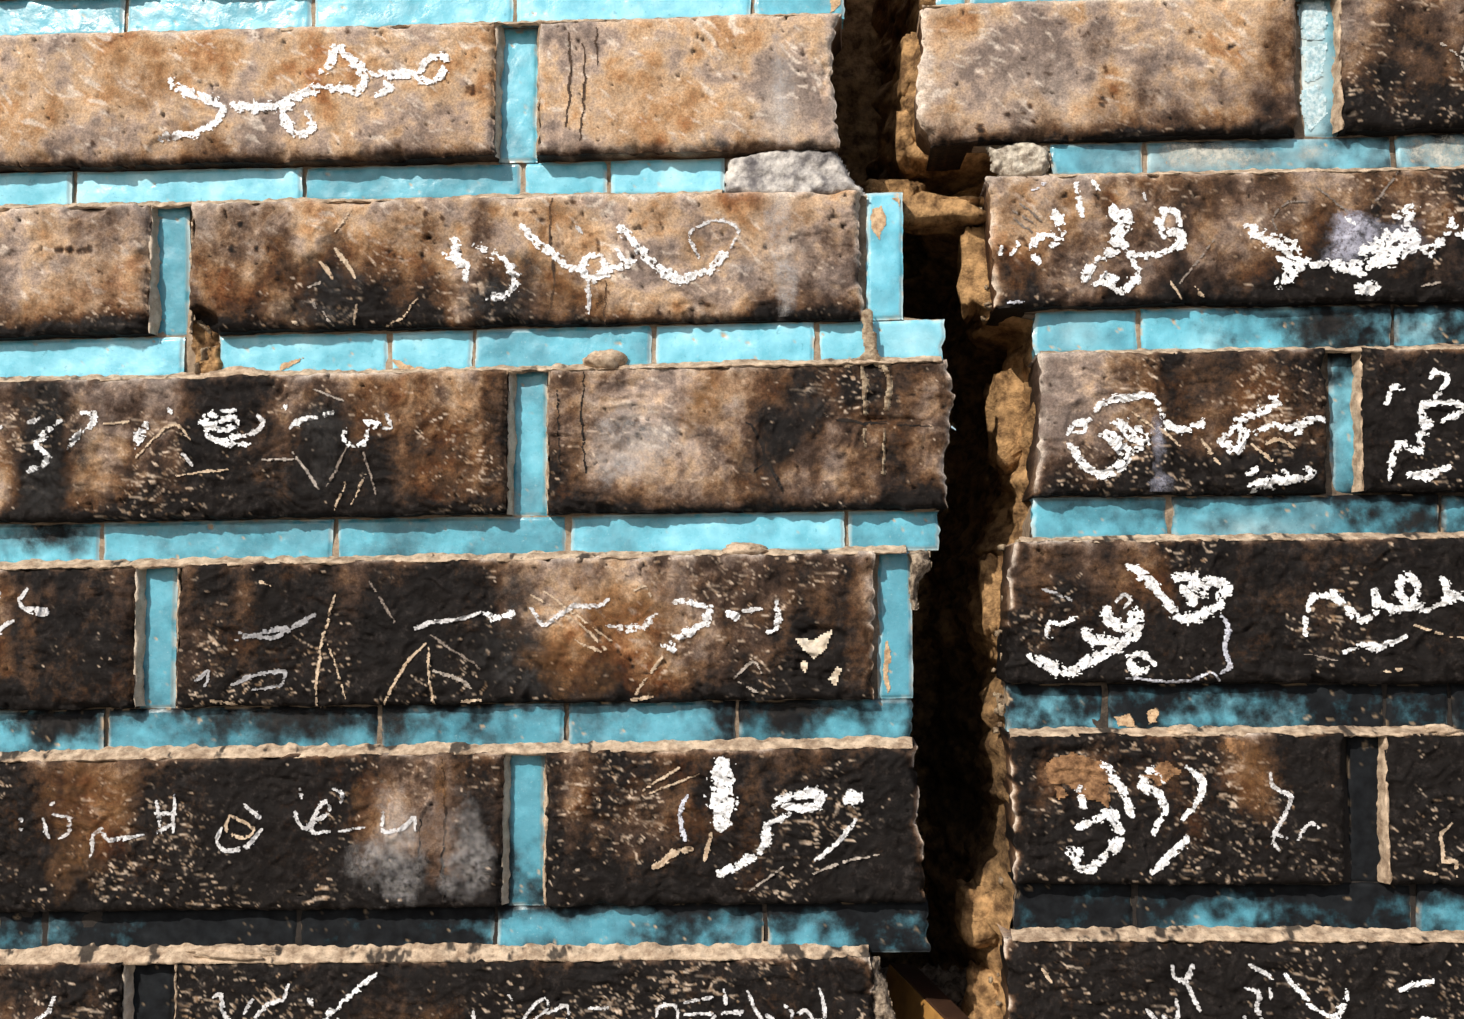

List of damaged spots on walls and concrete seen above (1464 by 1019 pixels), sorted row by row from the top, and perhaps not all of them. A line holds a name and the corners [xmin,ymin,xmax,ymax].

crack [565,27,599,141]
crack [745,422,783,494]
crack [797,0,1036,1019]